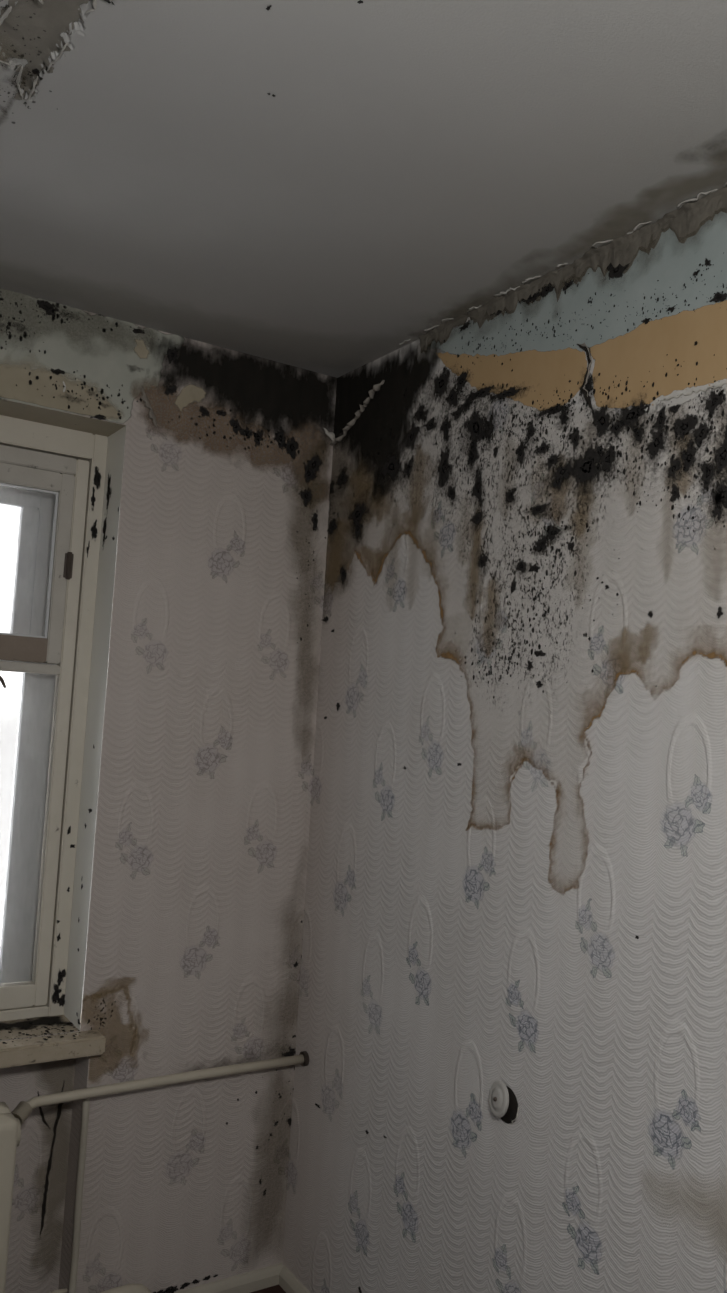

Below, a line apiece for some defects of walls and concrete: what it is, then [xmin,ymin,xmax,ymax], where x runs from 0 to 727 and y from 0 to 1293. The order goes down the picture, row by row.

spalling [0,0,114,109]
water stain [0,253,727,747]
water stain [256,1017,296,1149]